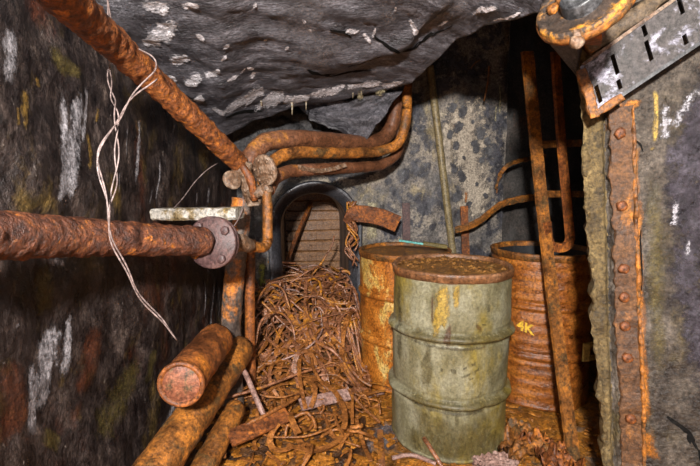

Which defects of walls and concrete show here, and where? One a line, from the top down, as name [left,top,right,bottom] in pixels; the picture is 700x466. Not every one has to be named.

water stain [142,0,179,47]
efflorescence [170,54,190,65]
crack [306,26,452,77]
efflorescence [58,90,88,199]
water stain [385,158,431,196]
water stain [485,85,504,235]